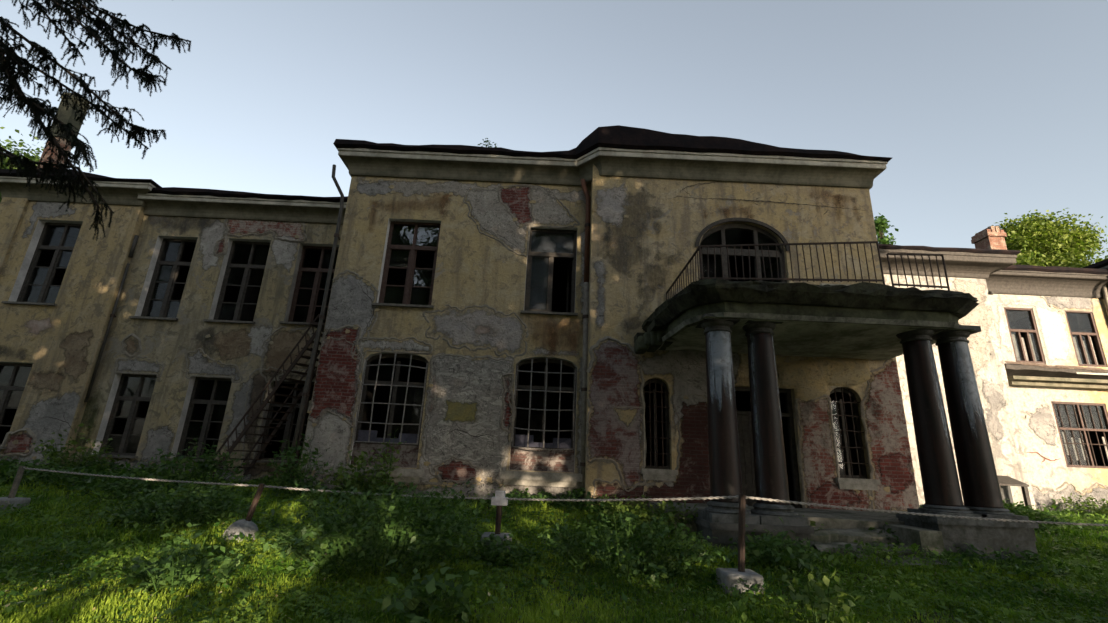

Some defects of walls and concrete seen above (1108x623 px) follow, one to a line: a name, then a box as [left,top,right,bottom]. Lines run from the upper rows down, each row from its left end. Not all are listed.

flaking render [200,218,307,272]
flaking render [353,176,629,257]
flaking render [0,330,93,467]
flaking render [96,259,760,510]
flaking render [795,357,920,511]